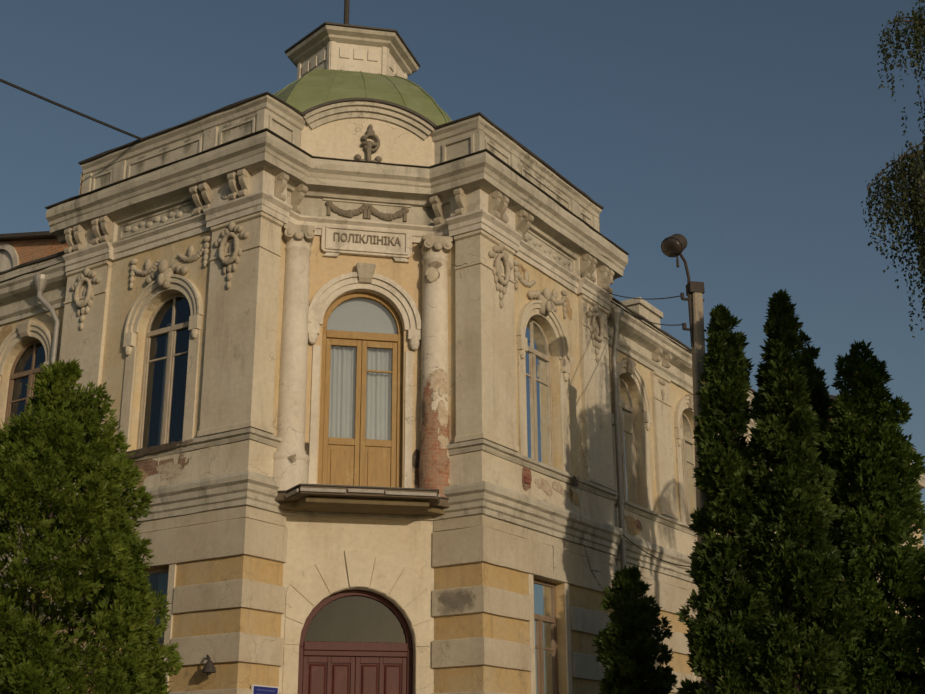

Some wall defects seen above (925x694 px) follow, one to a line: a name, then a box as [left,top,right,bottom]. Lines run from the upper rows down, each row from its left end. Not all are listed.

flaking render [419,368,450,498]
flaking render [128,439,193,487]
flaking render [522,467,580,507]
damp [440,592,472,612]